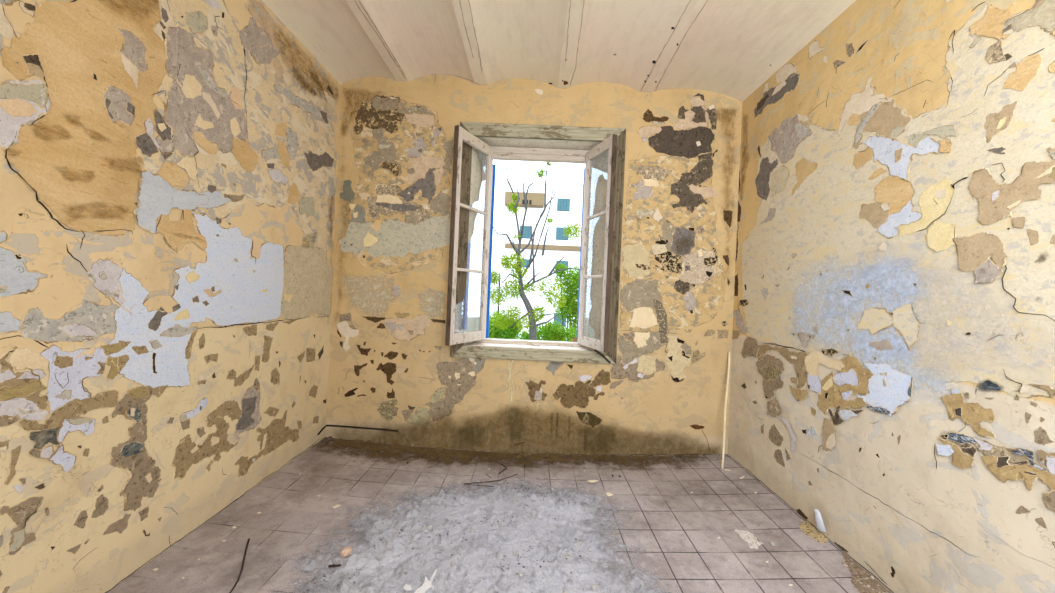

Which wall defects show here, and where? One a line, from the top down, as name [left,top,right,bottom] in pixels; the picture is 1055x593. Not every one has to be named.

crack [5,66,133,272]
peeling [0,0,486,556]
peeling [512,0,1055,532]
crack [1002,258,1055,321]
water stain [341,360,718,456]
spalling [834,537,896,584]